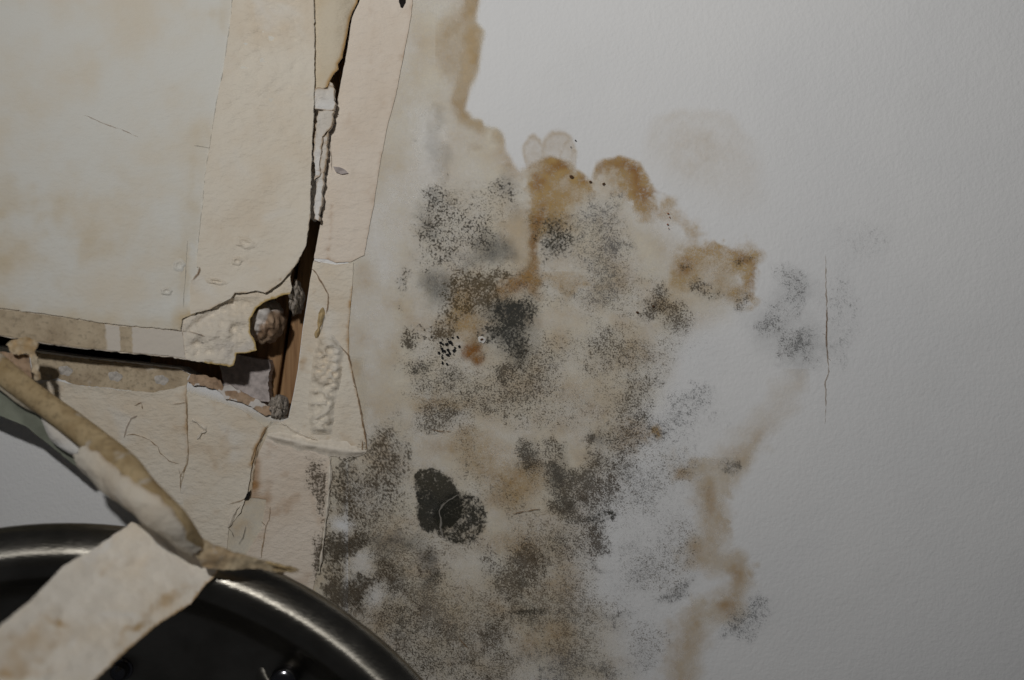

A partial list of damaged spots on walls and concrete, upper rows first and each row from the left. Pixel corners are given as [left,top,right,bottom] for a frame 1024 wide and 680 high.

flaking render [313,82,348,221]
water stain [305,0,722,680]
crack [822,258,830,421]
peeling [31,352,266,549]
crack [124,402,189,487]
crack [230,422,271,504]
water stain [227,412,277,555]
water stain [677,451,767,680]